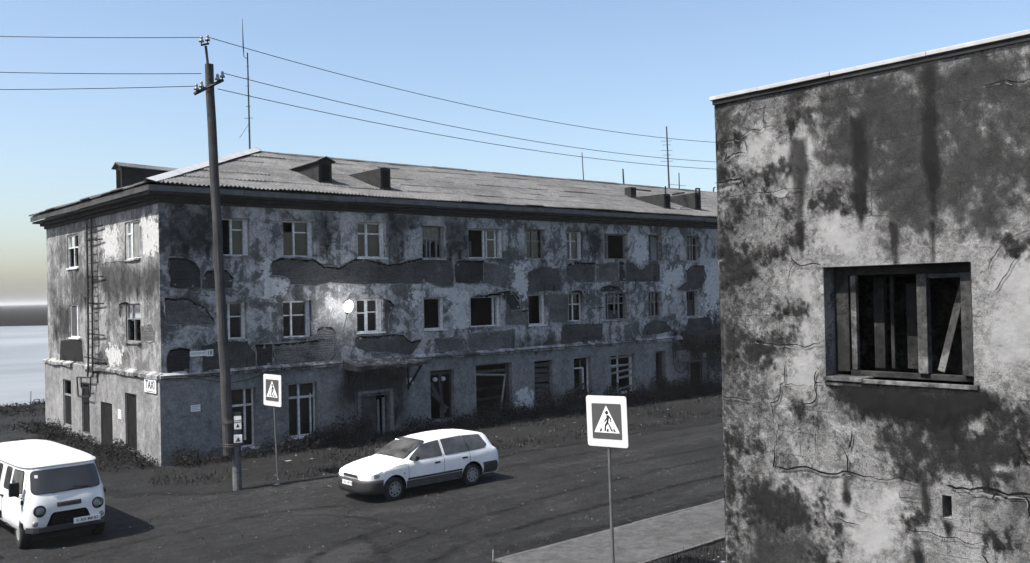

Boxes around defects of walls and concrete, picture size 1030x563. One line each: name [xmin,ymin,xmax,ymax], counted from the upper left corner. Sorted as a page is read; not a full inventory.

water stain [717,44,1030,292]
spalling [139,205,234,327]
spalling [165,230,720,375]
crack [988,230,1030,290]
water stain [828,381,1030,563]
crack [906,528,988,563]